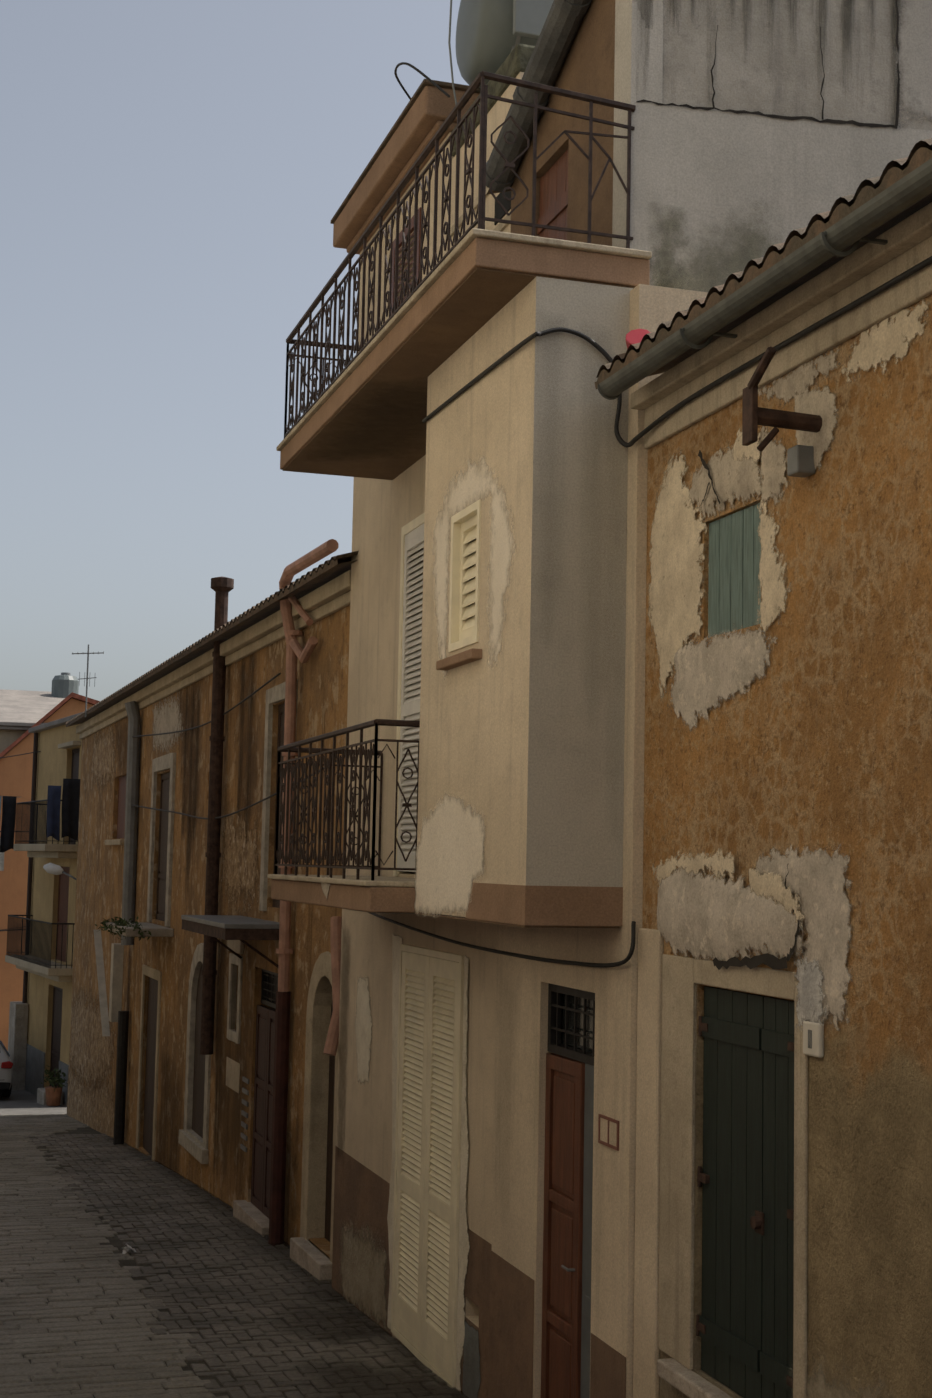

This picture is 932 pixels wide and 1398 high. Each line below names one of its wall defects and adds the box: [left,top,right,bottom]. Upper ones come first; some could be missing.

crack [636,0,901,129]
leakage [844,0,852,43]
peeling [648,448,792,732]
spalling [652,849,827,1031]